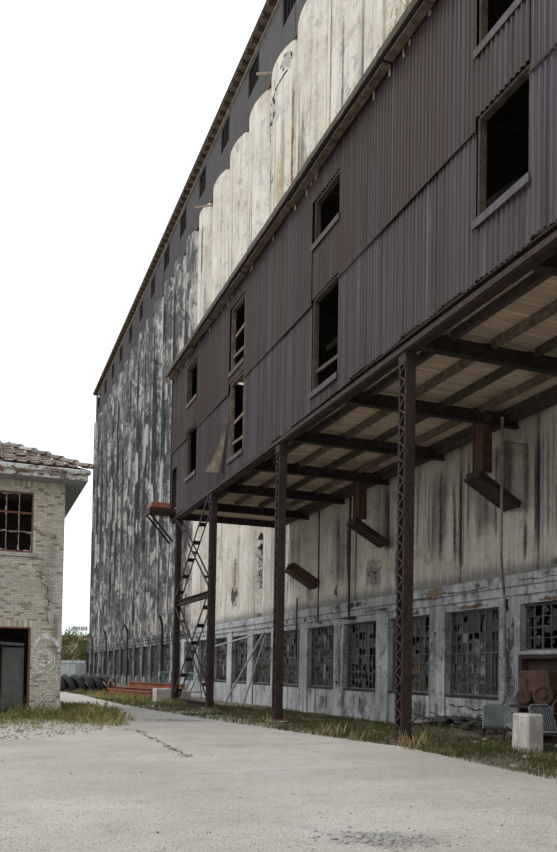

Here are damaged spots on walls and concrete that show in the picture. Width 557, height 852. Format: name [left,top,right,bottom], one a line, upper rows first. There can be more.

water stain [417,480,469,560]
water stain [524,446,557,555]